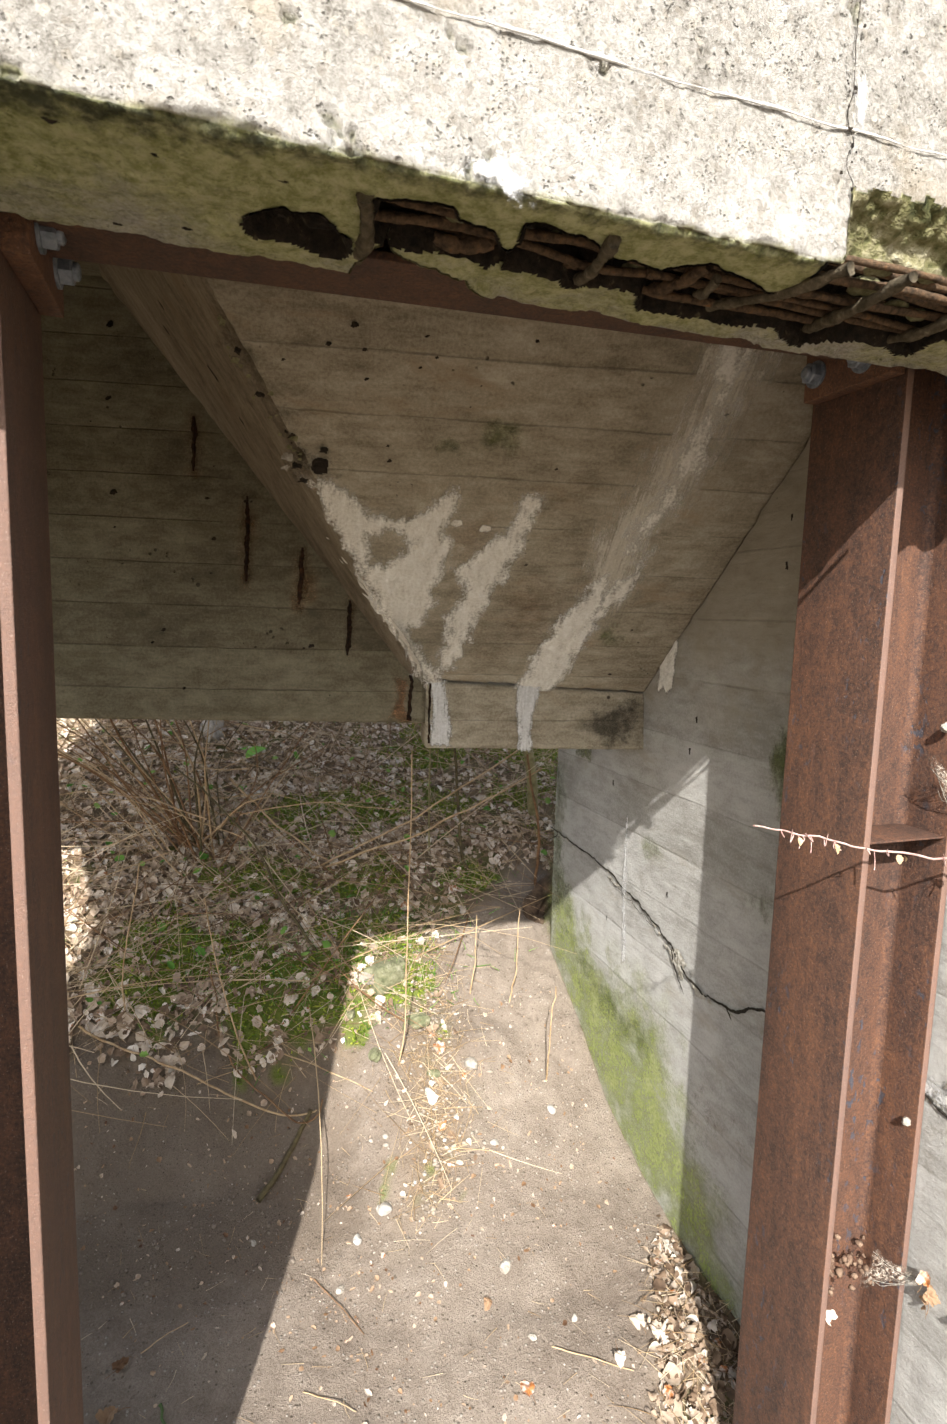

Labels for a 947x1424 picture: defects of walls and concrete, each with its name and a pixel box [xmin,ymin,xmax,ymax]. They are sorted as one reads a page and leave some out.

crack [839,0,866,196]
spalling [239,187,947,358]
corrosion [241,496,253,581]
corrosion [295,547,305,608]
leakage [310,479,541,746]
leakage [515,343,784,752]
crack [550,826,765,1019]
crack [925,1093,947,1118]